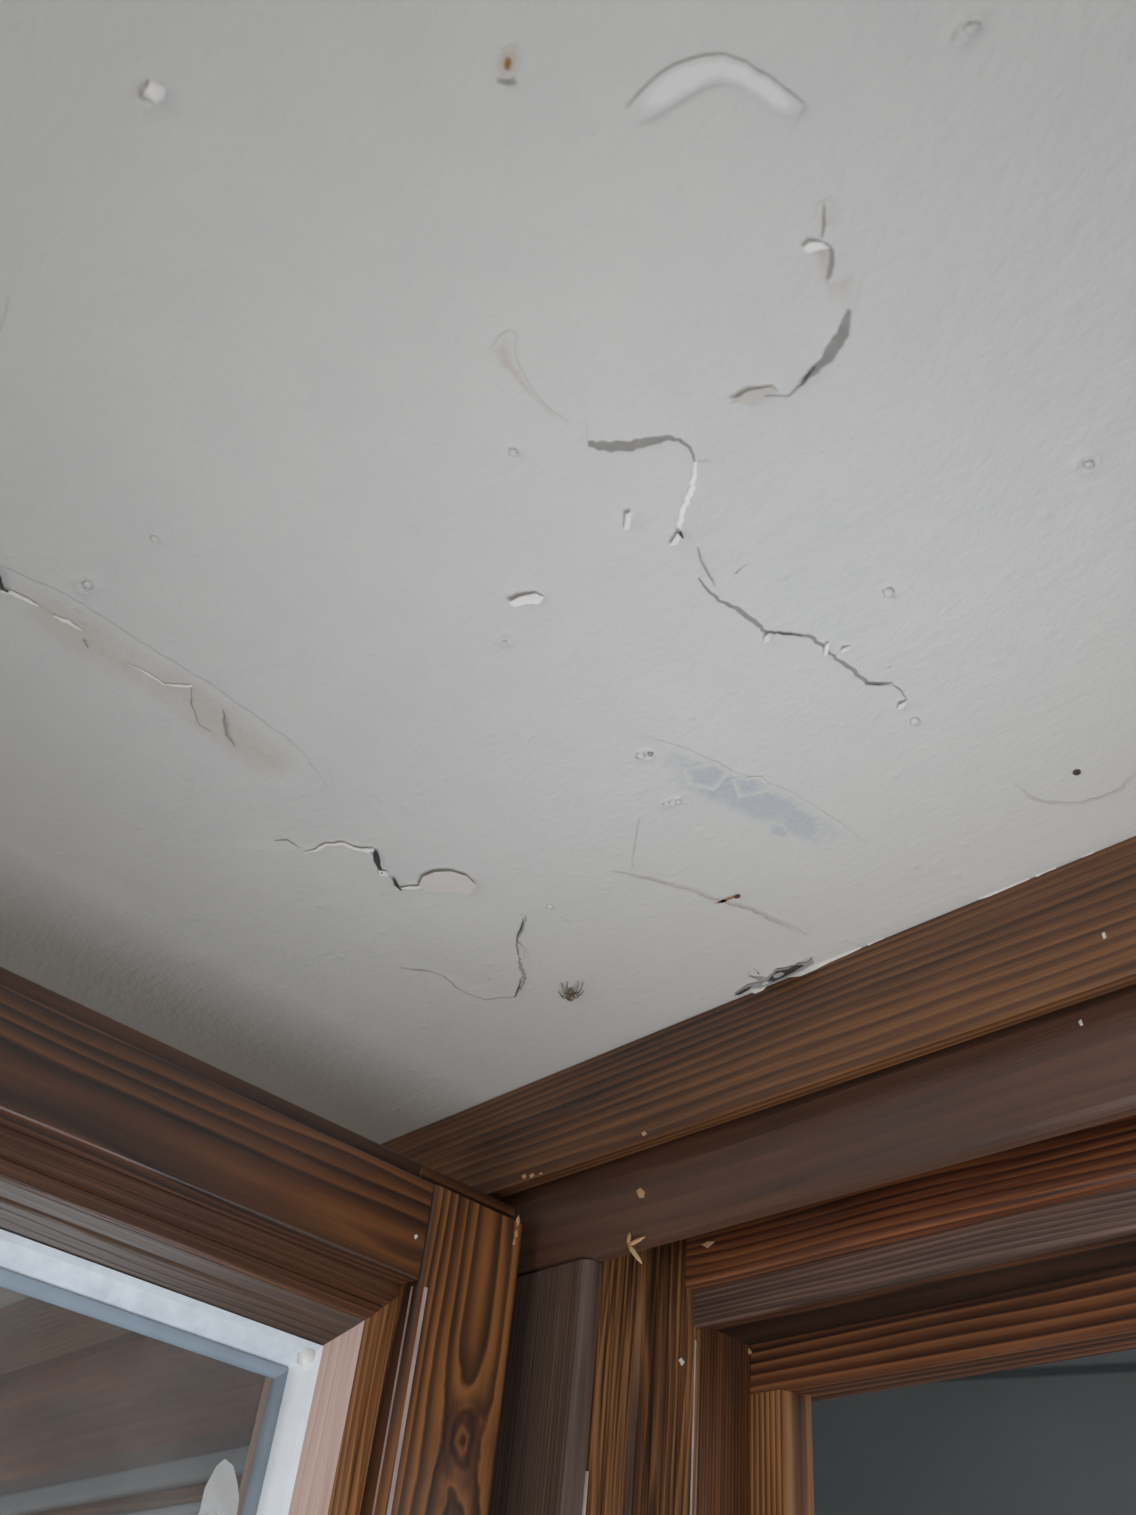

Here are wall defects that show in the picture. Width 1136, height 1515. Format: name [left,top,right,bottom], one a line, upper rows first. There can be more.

peeling [730,300,851,405]
crack [0,566,326,800]
crack [274,839,425,908]